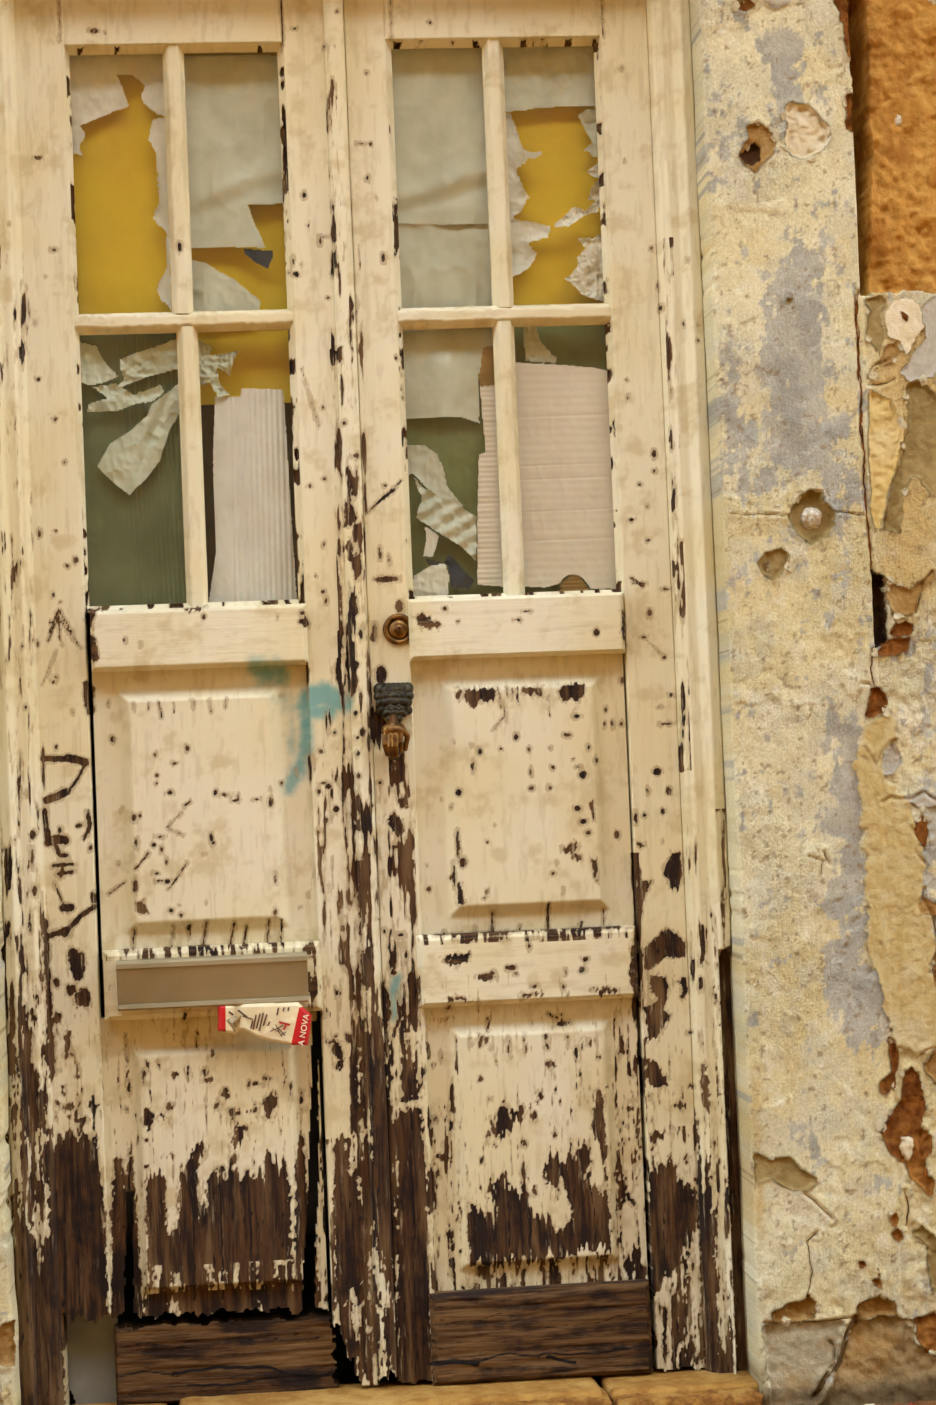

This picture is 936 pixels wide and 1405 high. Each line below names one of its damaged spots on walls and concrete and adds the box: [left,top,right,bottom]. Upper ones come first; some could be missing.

spalling [731,0,936,534]
crack [844,296,892,571]
peeling [870,568,936,657]
peeling [851,687,936,1197]
peeling [749,1150,818,1191]
flaking render [763,1210,936,1405]